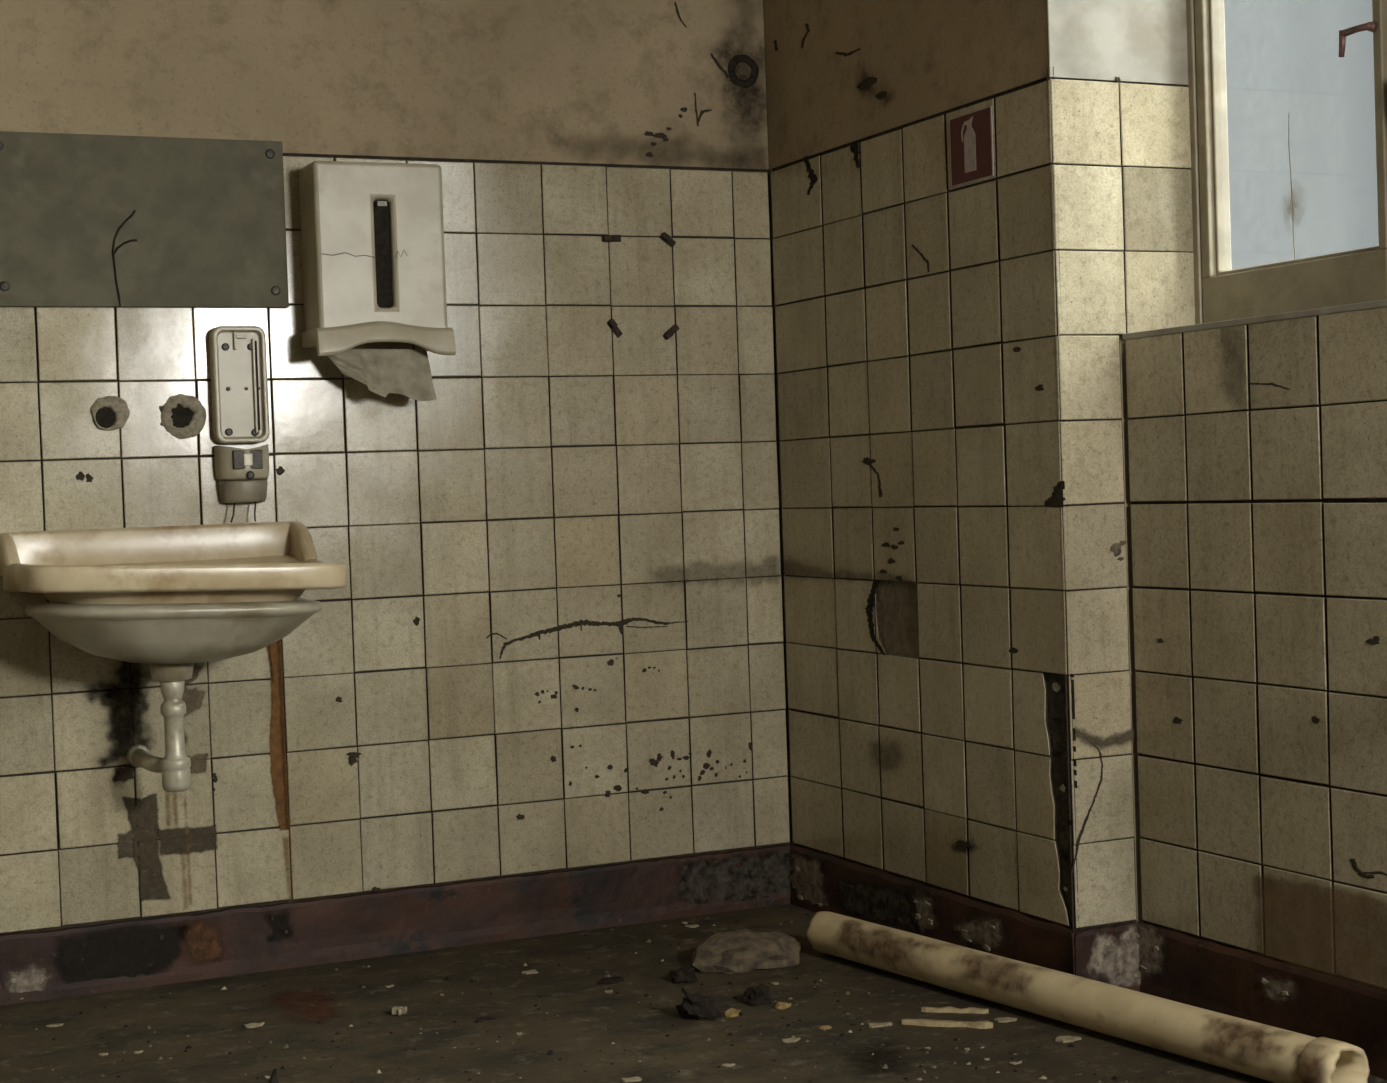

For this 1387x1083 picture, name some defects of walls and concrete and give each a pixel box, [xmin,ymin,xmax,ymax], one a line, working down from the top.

crack [486,617,688,659]
spalling [865,527,921,659]
rust [266,640,290,867]
spalling [1041,672,1079,923]
peeling [6,926,188,1000]
leakage [1256,877,1387,988]